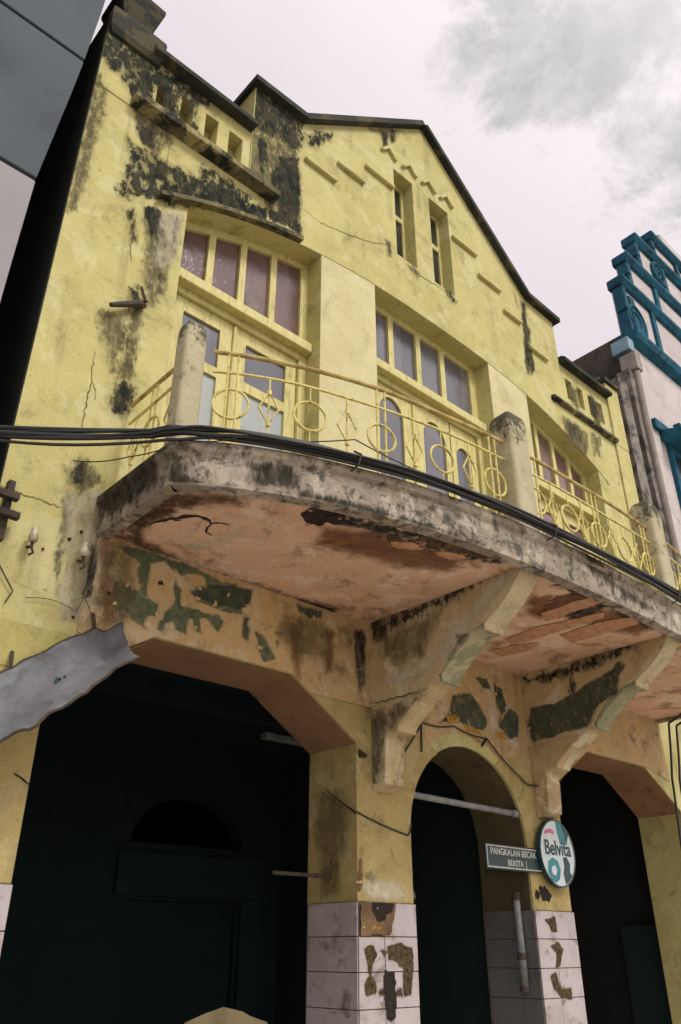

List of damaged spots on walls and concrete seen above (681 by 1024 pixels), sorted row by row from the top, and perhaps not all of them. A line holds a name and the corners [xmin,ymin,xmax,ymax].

mould [67,29,210,211]
water stain [99,88,333,419]
water stain [520,301,535,374]
crack [82,356,97,426]
crack [149,515,230,536]
spalling [301,508,346,527]
peeling [107,545,279,662]
water stain [240,461,514,691]
peeling [439,661,625,743]
peeling [536,886,552,902]